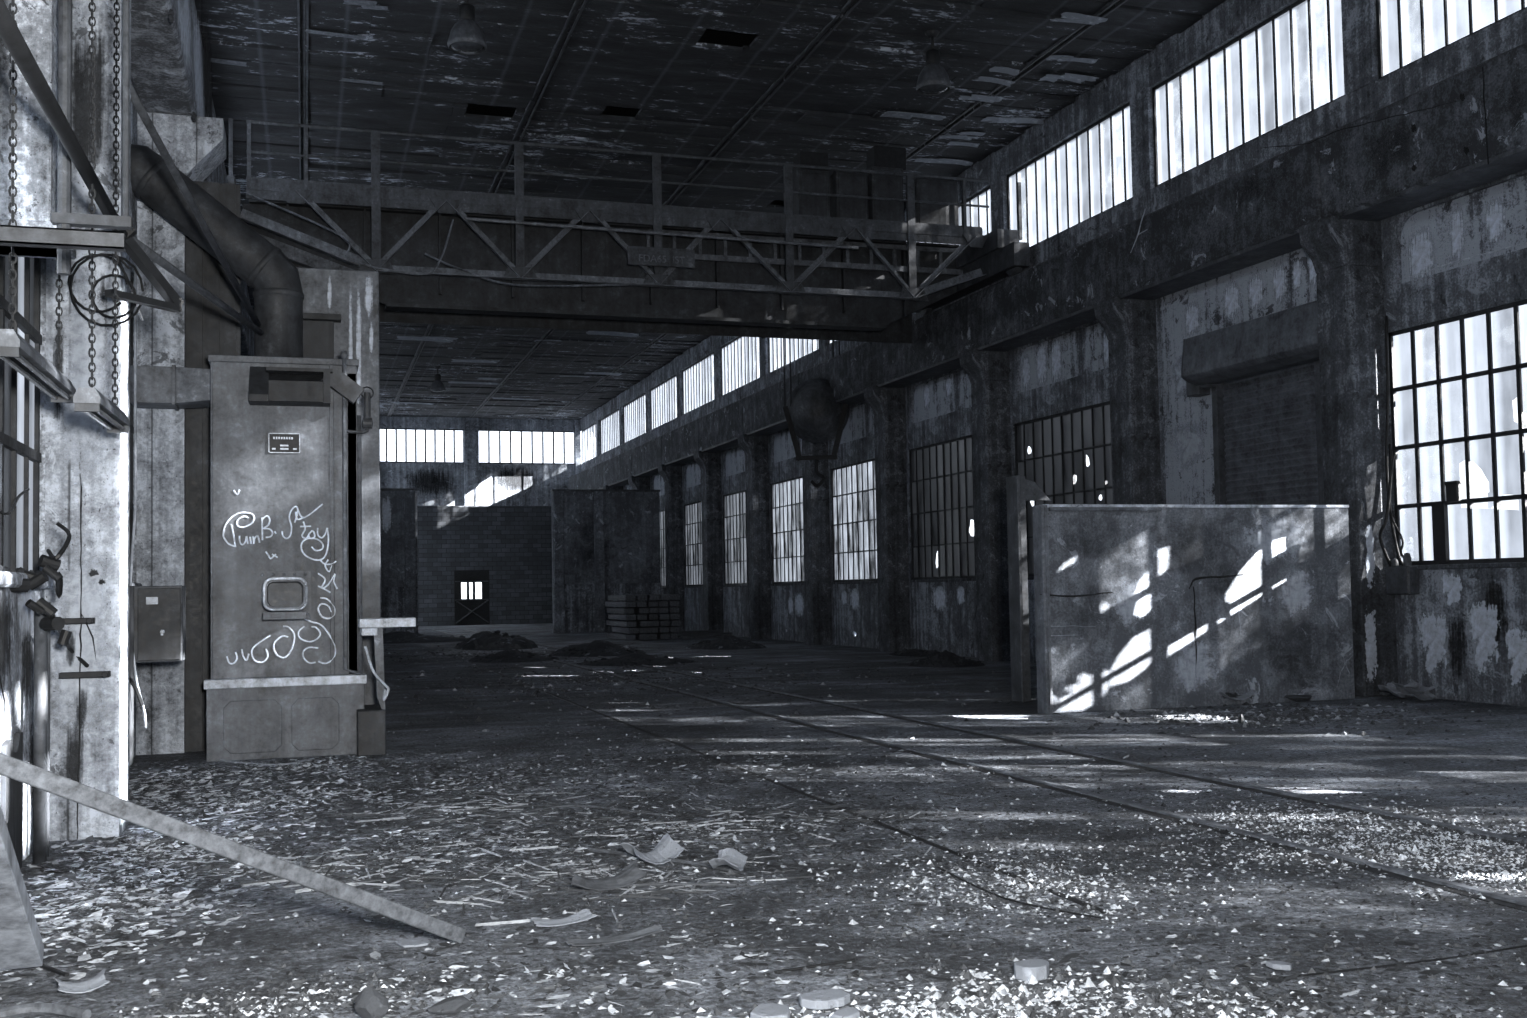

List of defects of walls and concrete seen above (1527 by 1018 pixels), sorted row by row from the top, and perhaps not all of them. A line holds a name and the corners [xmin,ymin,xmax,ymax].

peeling [343,0,388,10]
peeling [305,29,367,40]
peeling [211,58,247,67]
peeling [1417,570,1527,686]